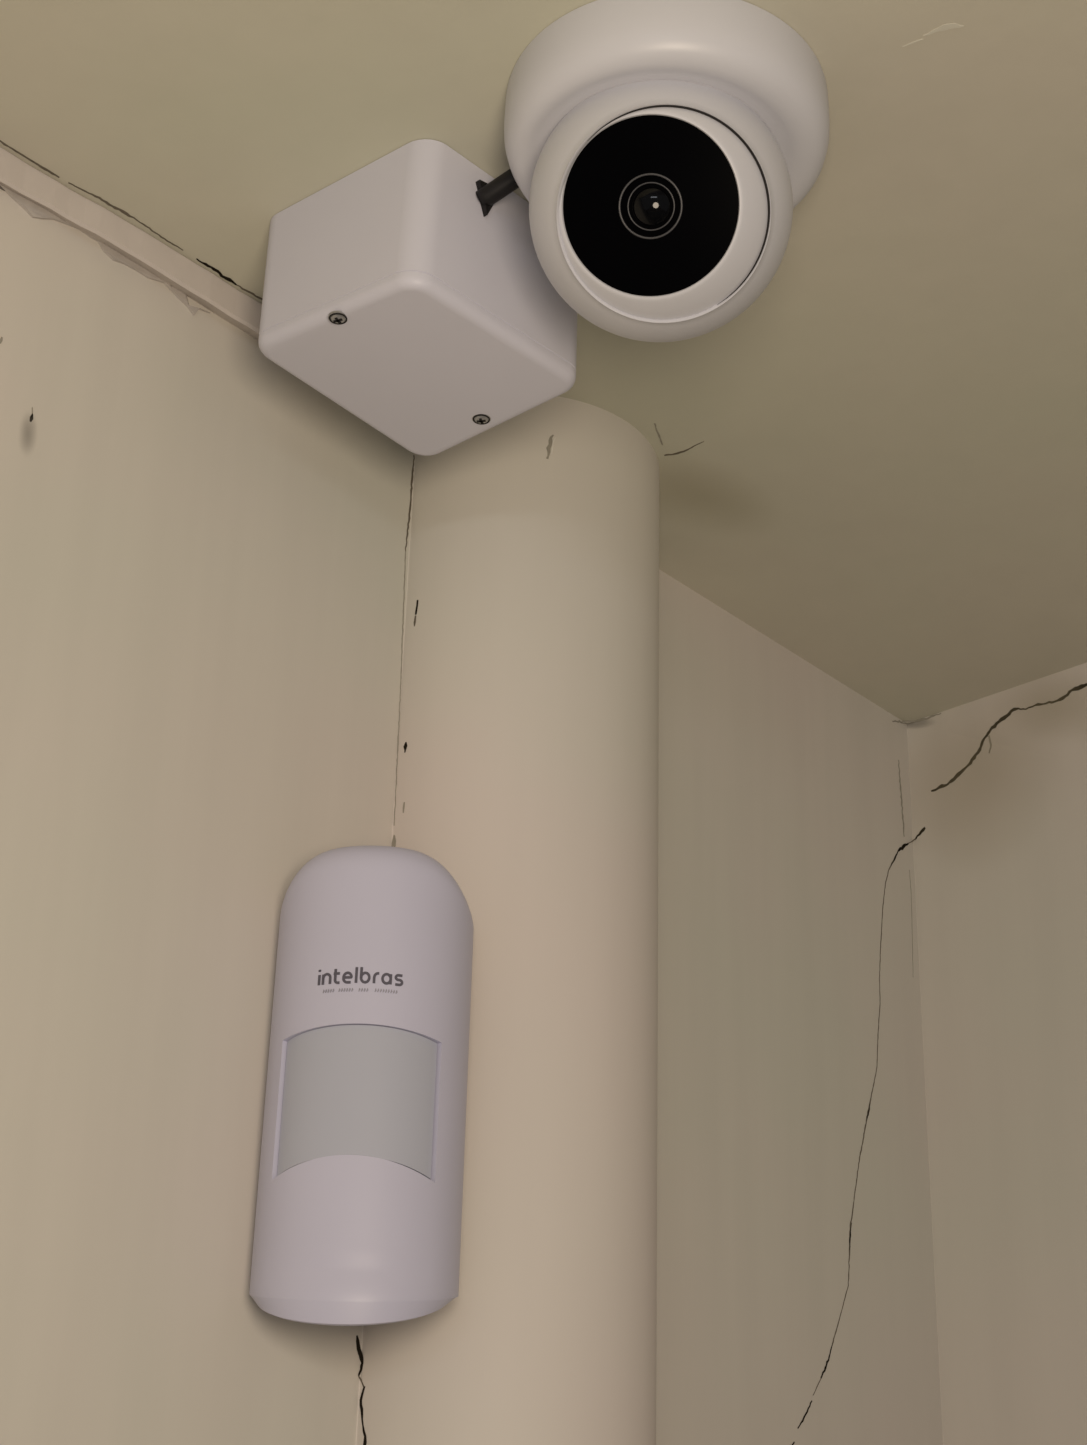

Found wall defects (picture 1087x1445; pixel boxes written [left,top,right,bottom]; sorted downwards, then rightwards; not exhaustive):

crack [0,140,263,300]
crack [792,683,1087,1445]